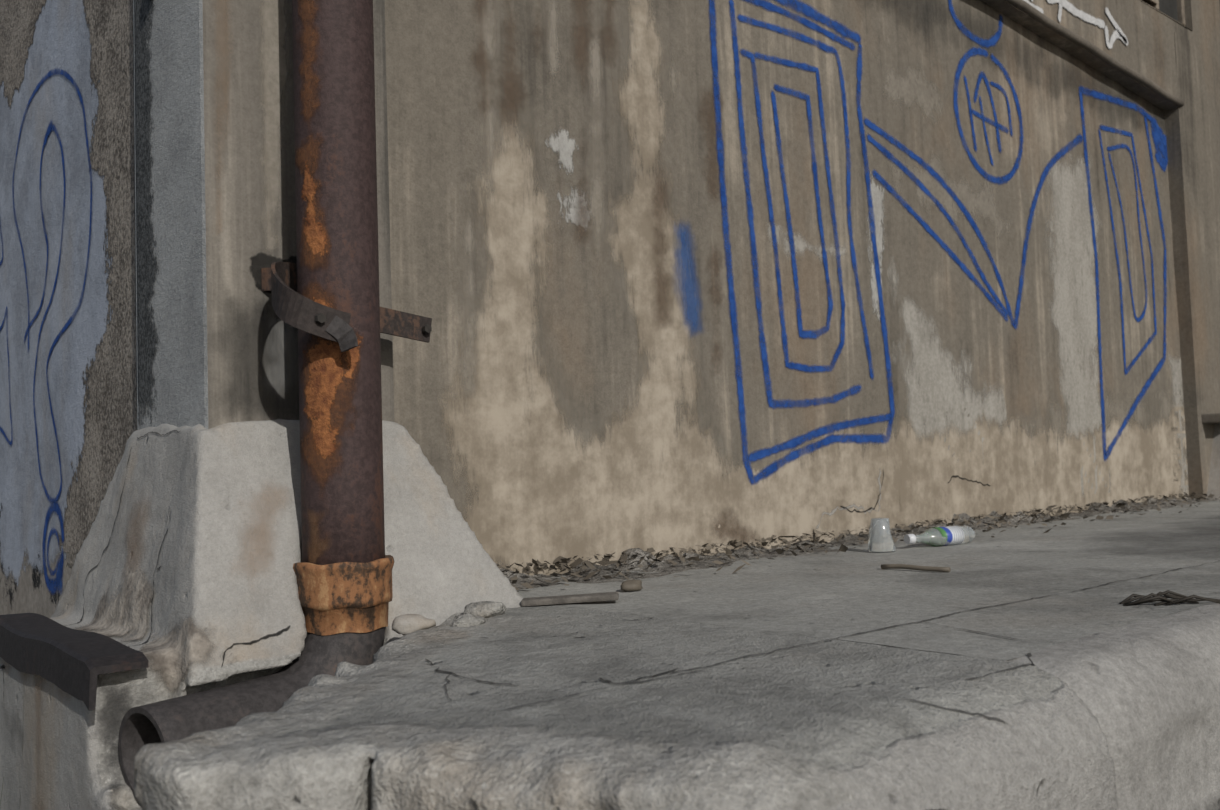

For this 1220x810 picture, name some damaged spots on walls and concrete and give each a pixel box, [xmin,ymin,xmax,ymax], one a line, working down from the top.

corrosion [299,0,319,120]
leakage [576,0,611,98]
corrosion [295,136,331,269]
leakage [581,175,602,250]
peeling [0,0,137,618]
corrosion [300,335,362,484]
crack [65,430,180,647]
crack [222,626,290,666]
crack [425,561,1217,711]
crack [894,697,1007,724]